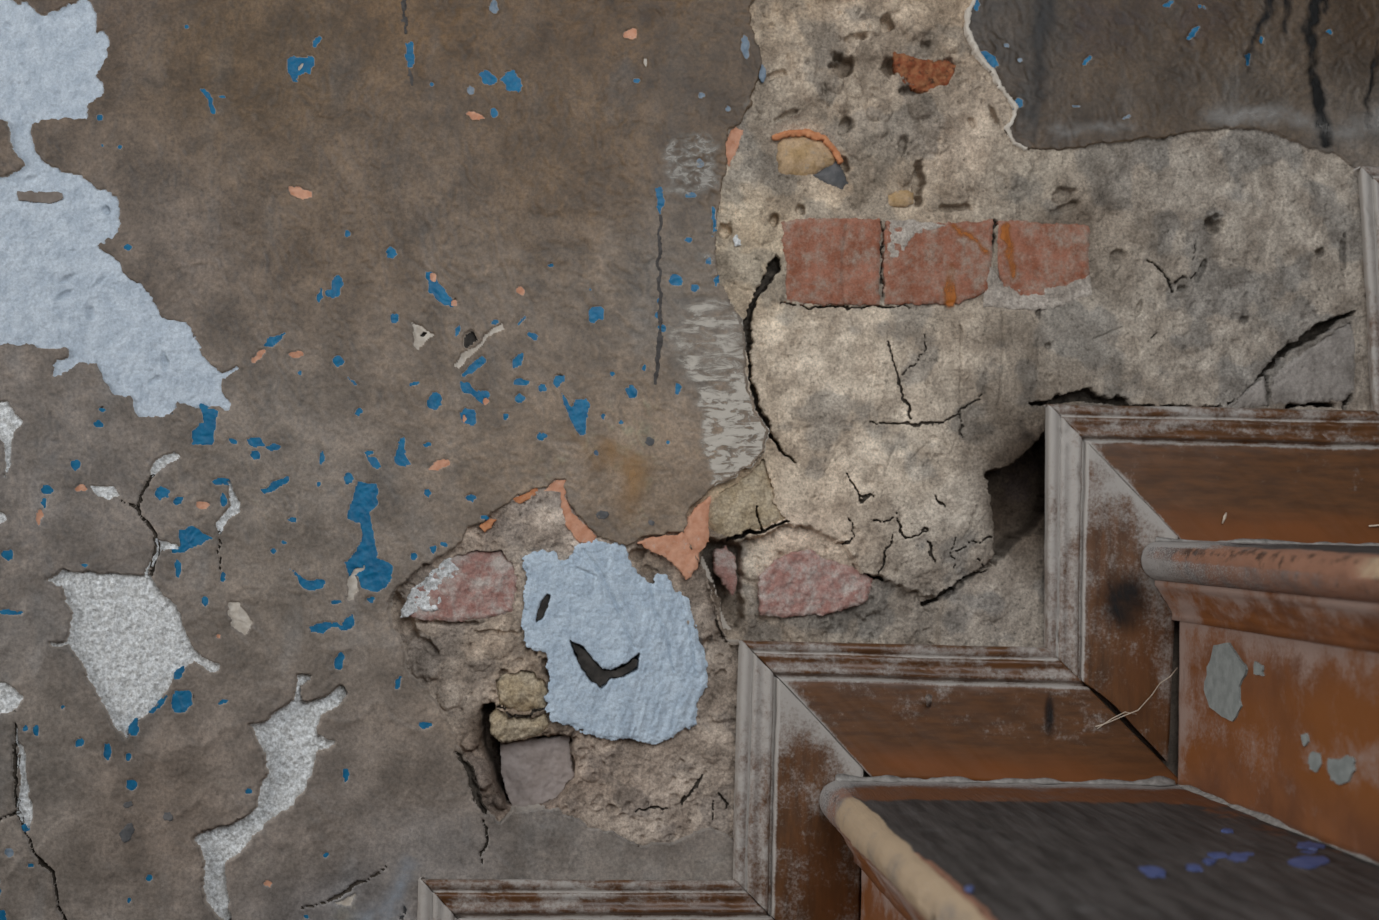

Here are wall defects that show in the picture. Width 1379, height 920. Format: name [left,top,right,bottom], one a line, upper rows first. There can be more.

water stain [1245,0,1331,148]
peeling [0,0,304,761]
flaking render [287,0,1371,845]
crack [742,222,982,461]
crack [990,219,998,251]
crack [1028,388,1230,407]
crack [1146,244,1201,293]
crack [1255,311,1353,409]
peeling [16,725,39,832]
crack [0,723,67,920]
peeling [119,780,137,843]
flaking render [195,652,348,920]